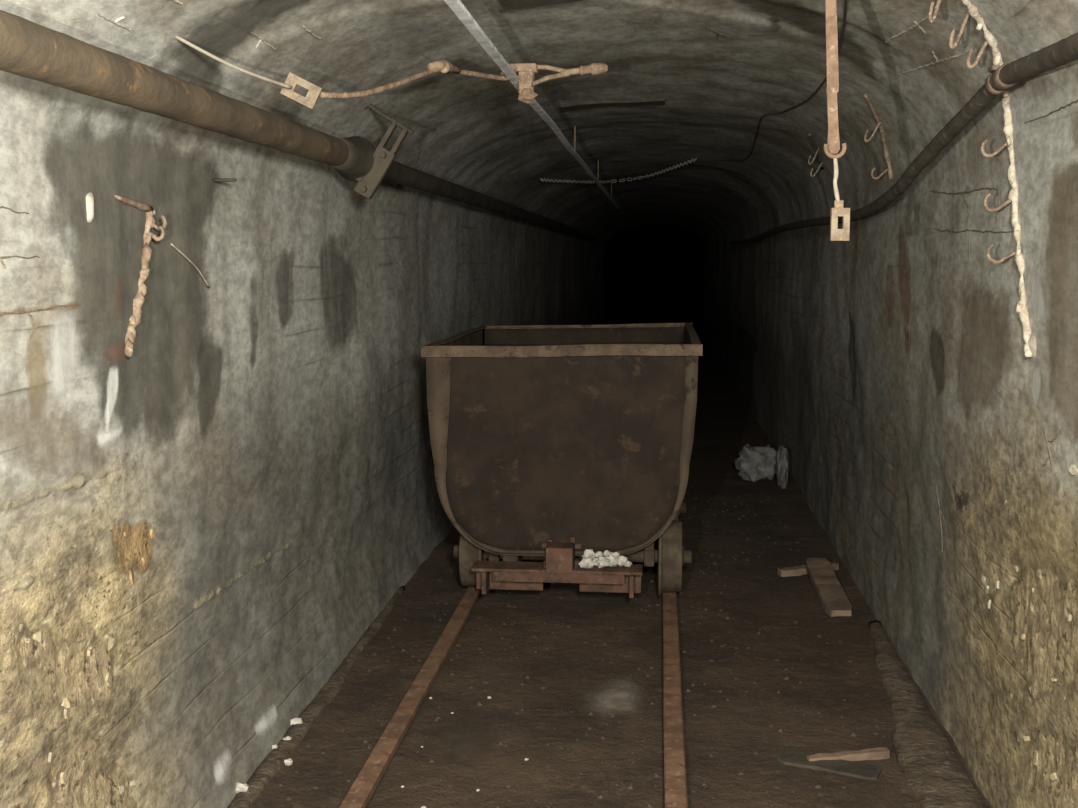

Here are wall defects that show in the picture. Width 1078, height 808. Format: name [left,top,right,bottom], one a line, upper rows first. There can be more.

crack [1024,99,1078,124]
crack [0,255,40,268]
crack [0,305,74,339]
leakage [45,121,222,458]
crack [931,187,1012,262]
leakage [1032,167,1078,438]